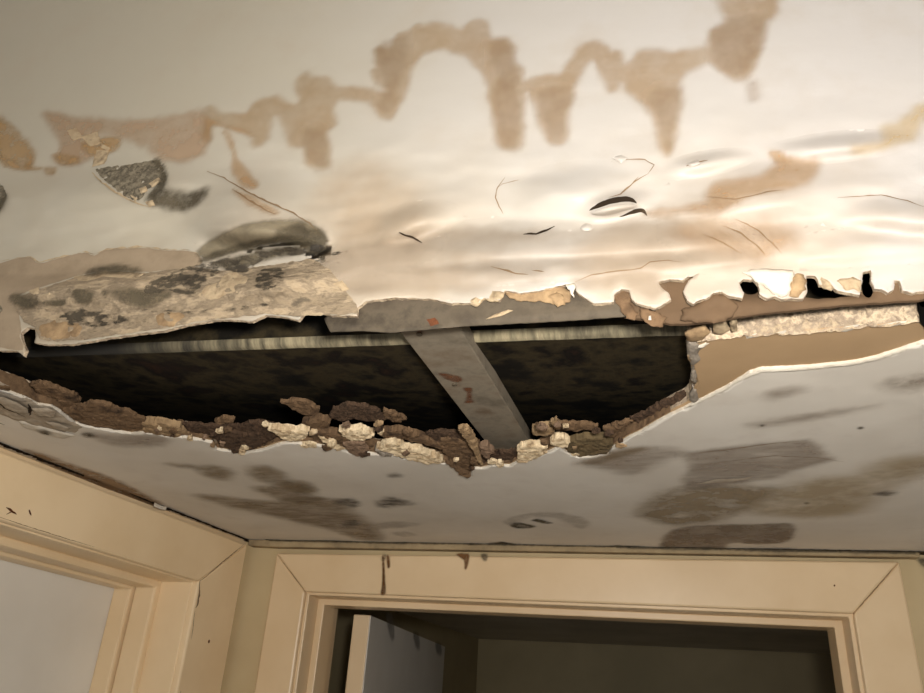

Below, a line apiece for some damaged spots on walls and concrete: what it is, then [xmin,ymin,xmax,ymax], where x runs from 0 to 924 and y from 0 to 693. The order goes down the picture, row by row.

flaking render [93,159,206,210]
mould [10,220,340,327]
flaking render [0,245,359,350]
peeling [470,283,575,319]
peeling [615,291,667,328]
peeling [743,268,807,298]
peeling [820,277,862,292]
peeling [680,294,924,409]
corrosion [440,374,473,403]
leakage [205,467,474,545]
leakage [611,440,924,563]
corrosion [381,555,390,595]